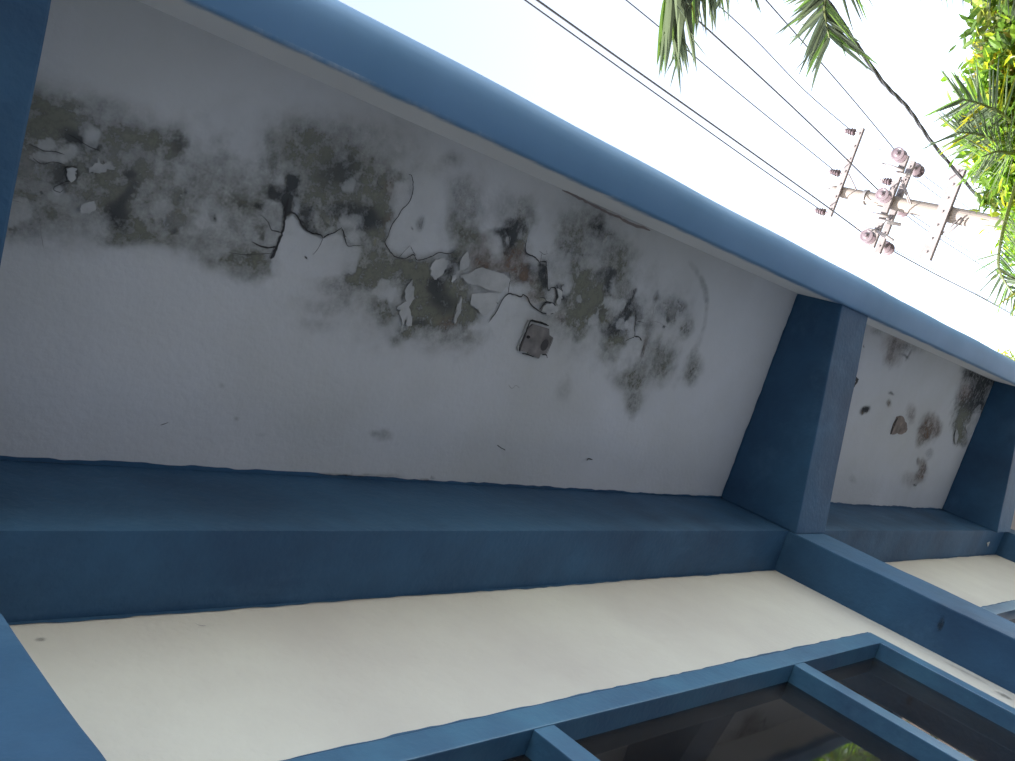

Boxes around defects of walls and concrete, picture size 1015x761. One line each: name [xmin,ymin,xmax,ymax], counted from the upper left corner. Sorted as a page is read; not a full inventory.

flaking render [66,158,116,182]
leakage [8,92,201,246]
leakage [208,227,269,274]
crack [228,198,361,259]
flaking render [397,279,415,327]
crack [385,174,453,261]
leakage [219,125,638,350]
flaking render [430,252,510,324]
crack [488,229,564,323]
crack [562,190,650,231]
leakage [953,370,995,445]